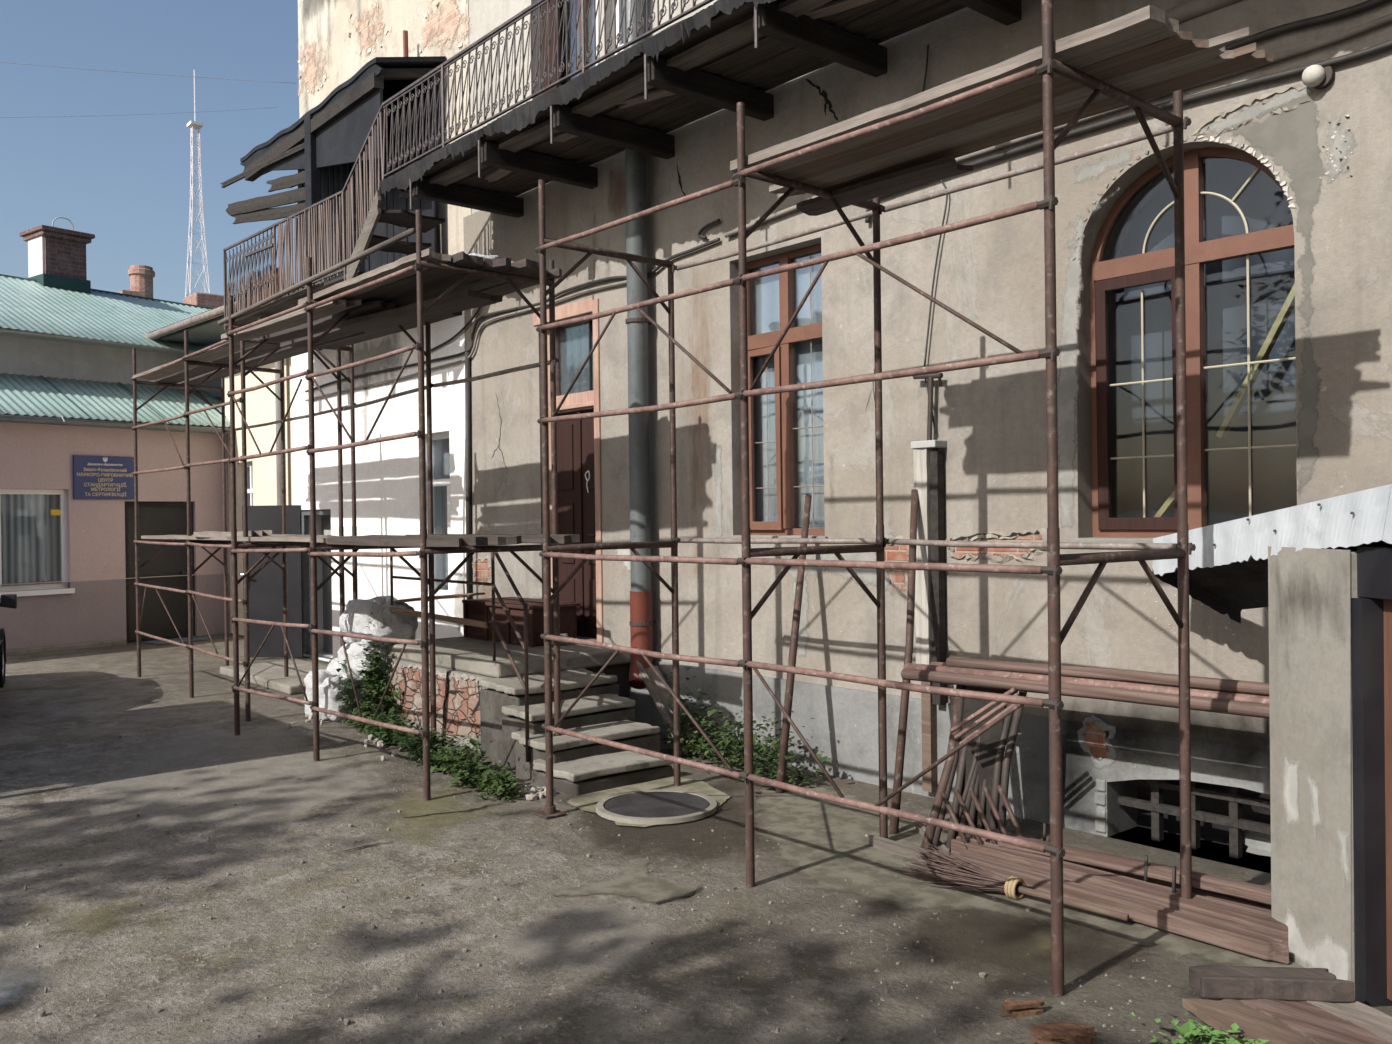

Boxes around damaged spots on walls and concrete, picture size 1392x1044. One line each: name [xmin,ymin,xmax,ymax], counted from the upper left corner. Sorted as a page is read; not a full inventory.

peeling [348,2,391,56]
peeling [408,0,470,56]
peeling [298,39,329,96]
crack [806,79,838,120]
flaking render [874,535,910,599]
flaking render [946,528,1047,565]
flaking render [1077,713,1117,770]